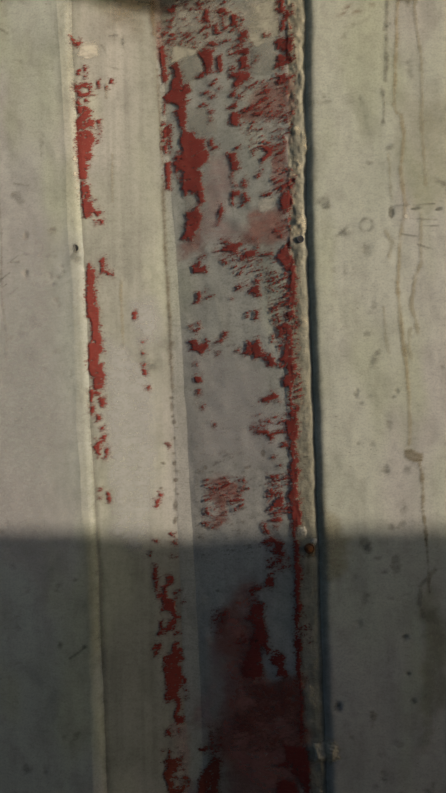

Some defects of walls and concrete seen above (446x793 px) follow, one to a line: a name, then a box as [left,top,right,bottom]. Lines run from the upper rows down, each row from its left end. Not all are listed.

peeling [72,64,114,225]
peeling [83,254,114,459]
peeling [158,0,314,793]
peeling [149,540,189,737]